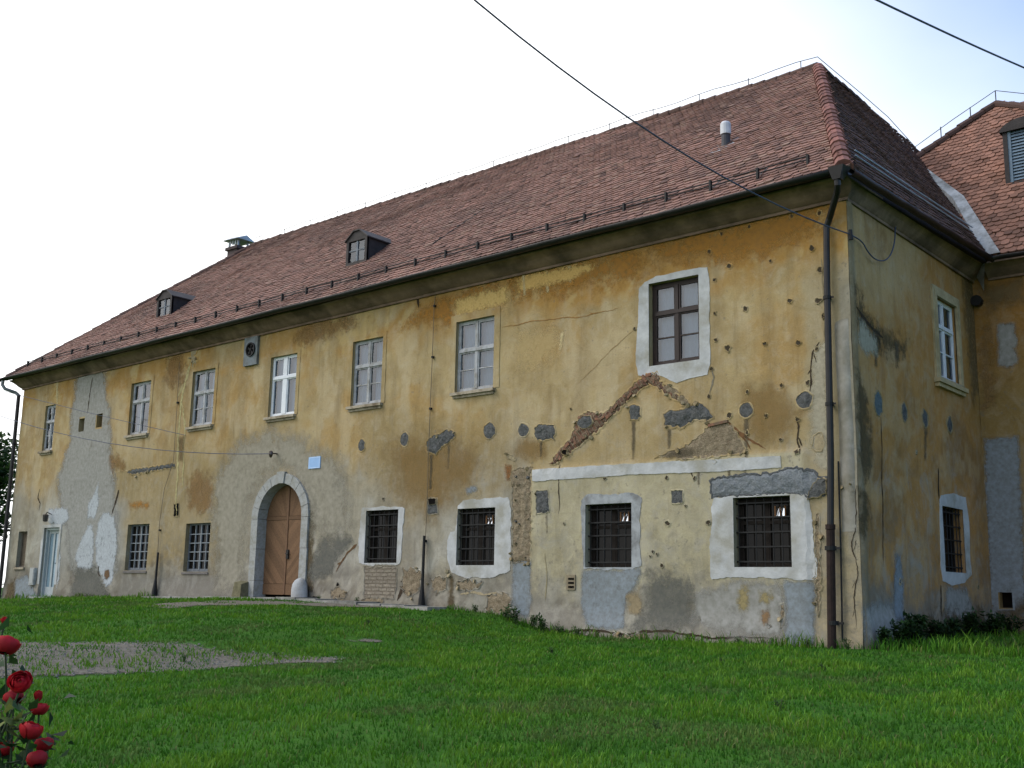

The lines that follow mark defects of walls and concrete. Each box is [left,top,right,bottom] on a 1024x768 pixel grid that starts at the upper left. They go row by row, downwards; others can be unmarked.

crack [505,307,620,327]
leakage [855,292,906,365]
flaking render [517,371,769,466]
peeling [48,507,69,524]
peeling [75,486,117,587]
leakage [307,511,351,592]
spalling [399,566,513,615]
flaking render [504,452,536,566]
leakage [625,573,696,631]
crack [850,485,858,629]